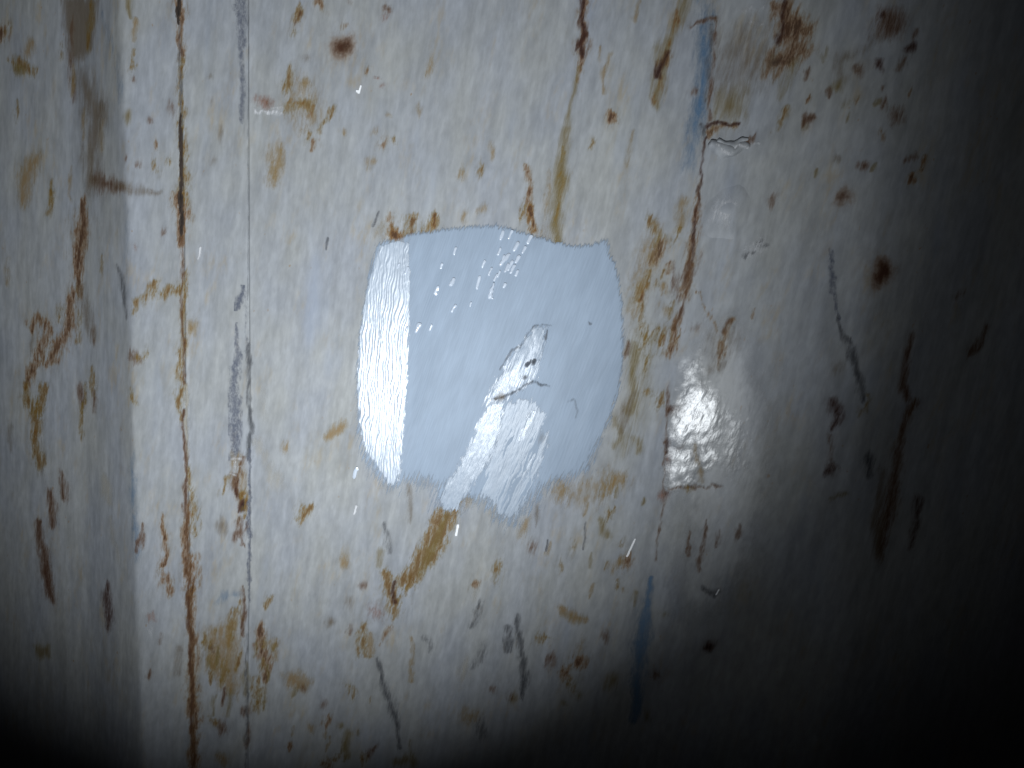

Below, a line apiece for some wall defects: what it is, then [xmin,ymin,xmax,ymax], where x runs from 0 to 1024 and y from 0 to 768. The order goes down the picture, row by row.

corrosion [763,0,813,79]
corrosion [553,128,567,244]
crack [666,17,740,356]
corrosion [23,196,88,469]
corrosion [77,367,95,437]
corrosion [382,509,458,620]
corrosion [241,623,277,714]